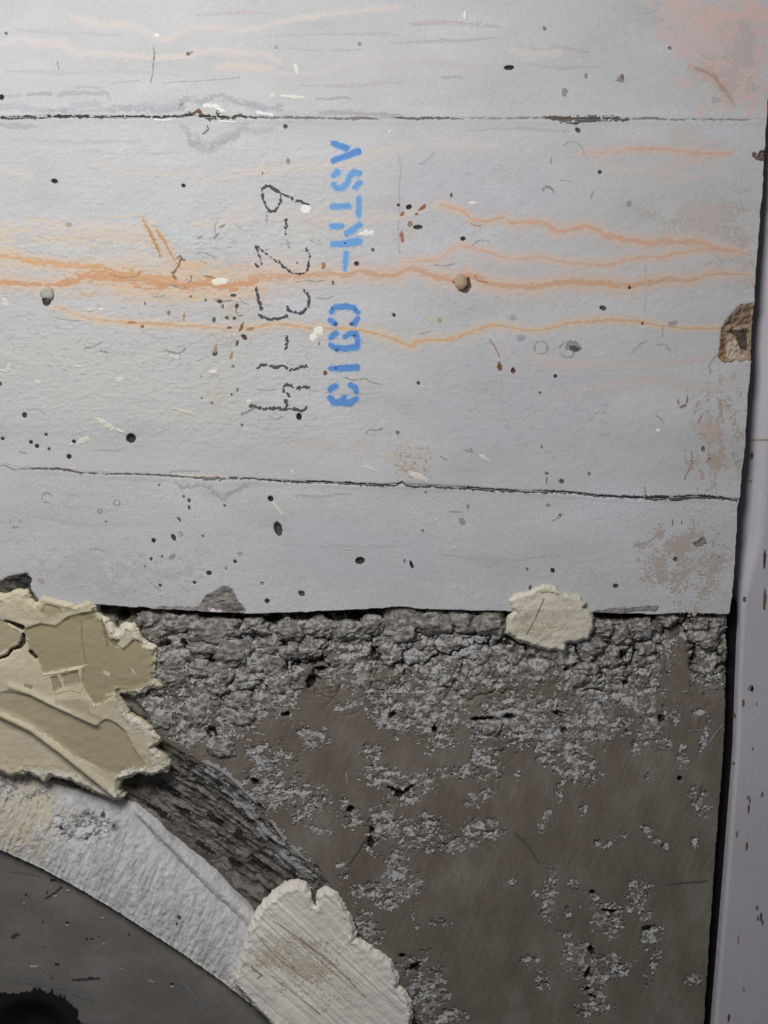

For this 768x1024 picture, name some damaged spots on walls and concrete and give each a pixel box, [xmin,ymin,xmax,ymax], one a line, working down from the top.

crack [0,47,750,461]
rust [0,192,754,361]
spalling [718,303,754,362]
crack [0,449,738,521]
spalling [0,573,45,602]
spalling [0,774,50,802]
flaking render [135,585,727,945]
spalling [394,948,470,1024]
spalling [519,956,551,990]
spalling [532,865,665,1018]